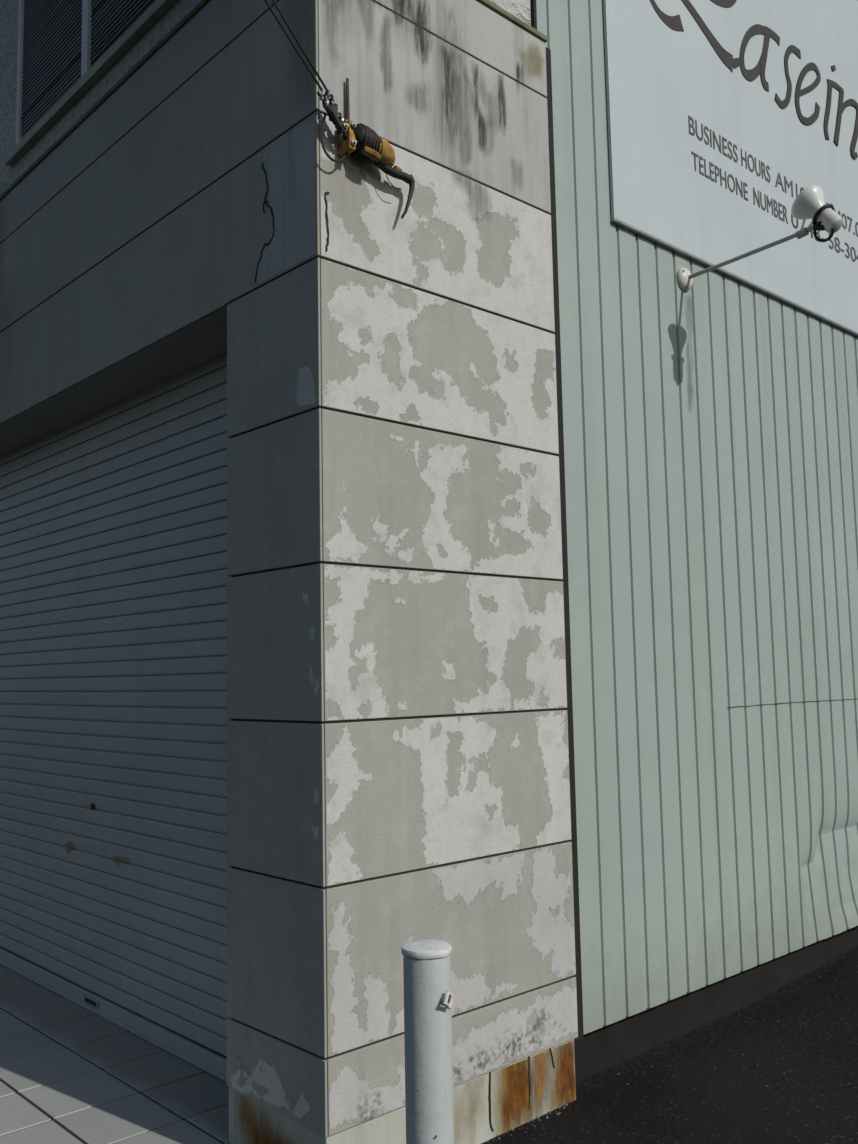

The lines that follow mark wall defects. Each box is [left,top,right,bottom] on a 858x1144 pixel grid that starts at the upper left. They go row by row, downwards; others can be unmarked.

damp [395,0,429,59]
damp [444,50,452,117]
damp [474,68,486,145]
crack [255,162,275,283]
crack [323,192,331,252]
peeling [256,113,578,1086]
peeling [328,901,405,1131]
spalling [230,1056,310,1119]
corrosion [500,1042,576,1133]